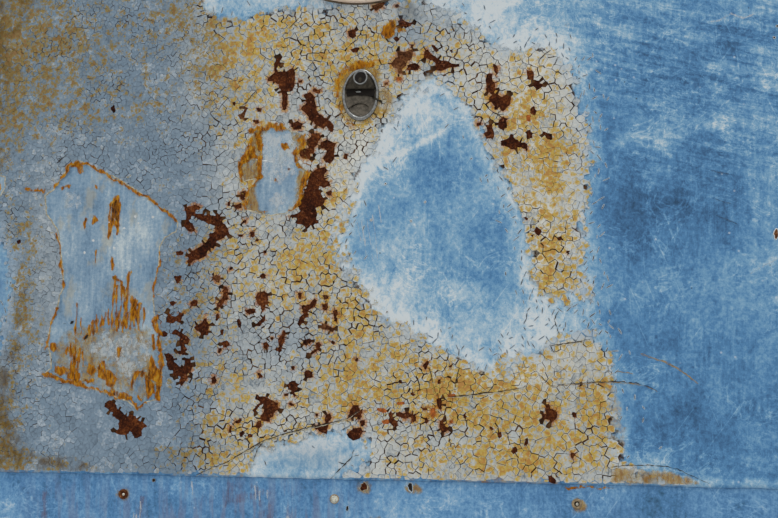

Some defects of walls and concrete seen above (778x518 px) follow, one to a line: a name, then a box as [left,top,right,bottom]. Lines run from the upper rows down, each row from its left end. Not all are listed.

rust [268,57,302,110]
rust [334,19,459,128]
rust [476,64,552,152]
peeling [237,122,313,217]
rust [290,88,348,229]
rust [176,205,258,264]
peeling [25,160,178,410]
rust [162,301,193,386]
rust [229,394,279,438]
crack [471,384,502,396]
crack [523,307,543,330]
crack [597,379,641,387]